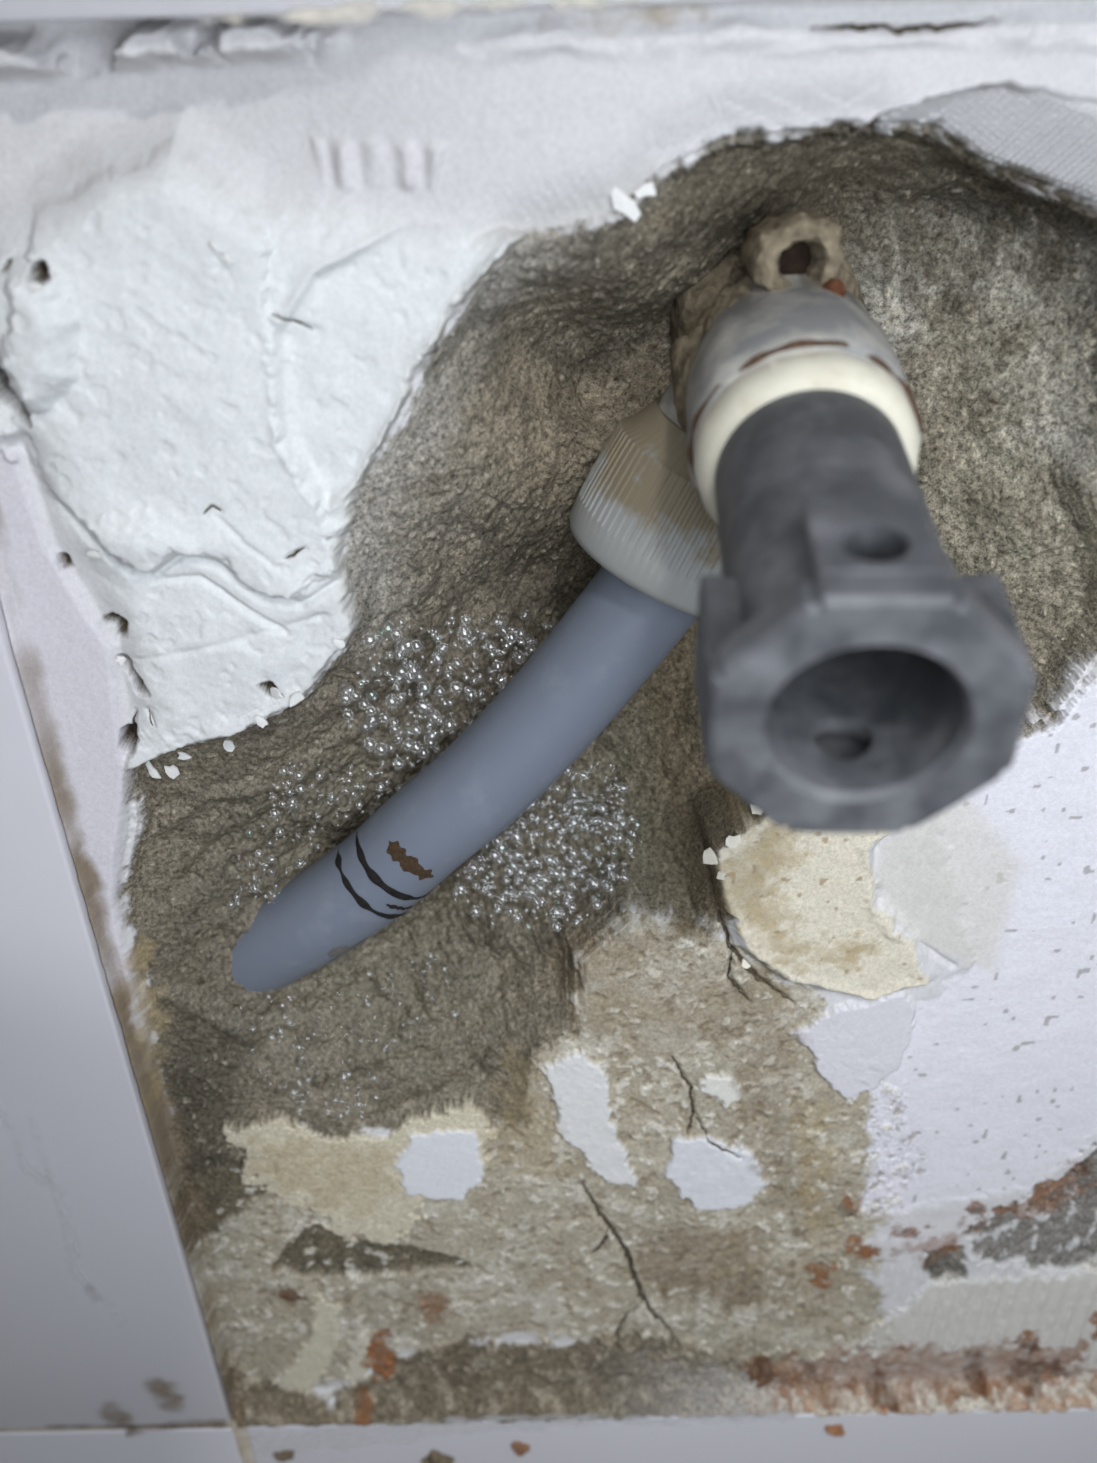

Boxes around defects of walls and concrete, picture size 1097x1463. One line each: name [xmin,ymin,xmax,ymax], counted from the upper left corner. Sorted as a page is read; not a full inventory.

spalling [0,116,1097,1284]
crack [702,835,793,1002]
crack [580,1182,673,1343]
rust [806,1236,881,1289]
spalling [212,1291,998,1428]
rust [999,1313,1097,1386]